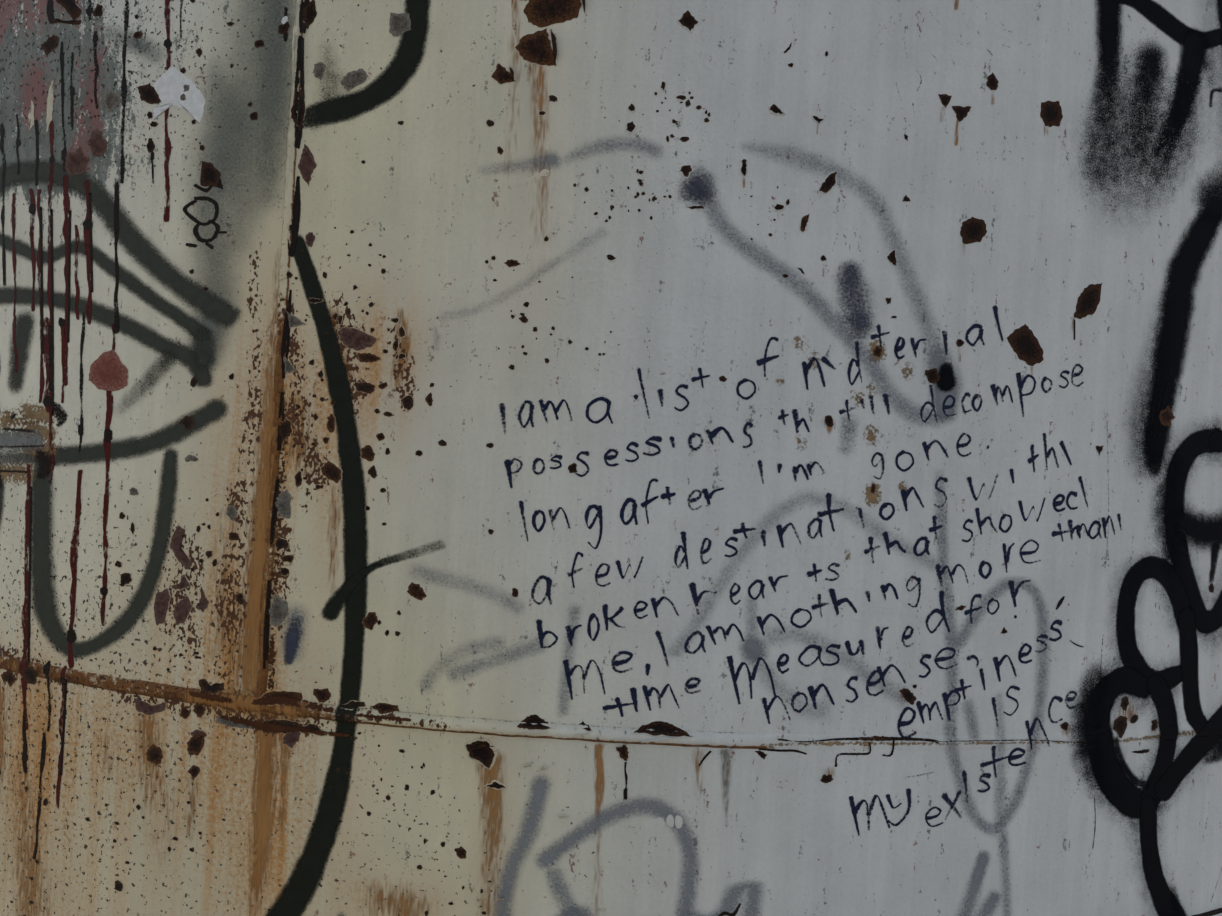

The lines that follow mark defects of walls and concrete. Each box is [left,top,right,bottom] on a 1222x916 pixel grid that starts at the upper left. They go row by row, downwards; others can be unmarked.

peeling [491,63,516,85]
corrosion [516,56,544,138]
corrosion [0,250,450,916]
peeling [515,712,554,735]
peeling [574,718,594,732]
peeling [615,718,694,763]
peeling [484,780,507,790]
corrosion [481,755,502,871]